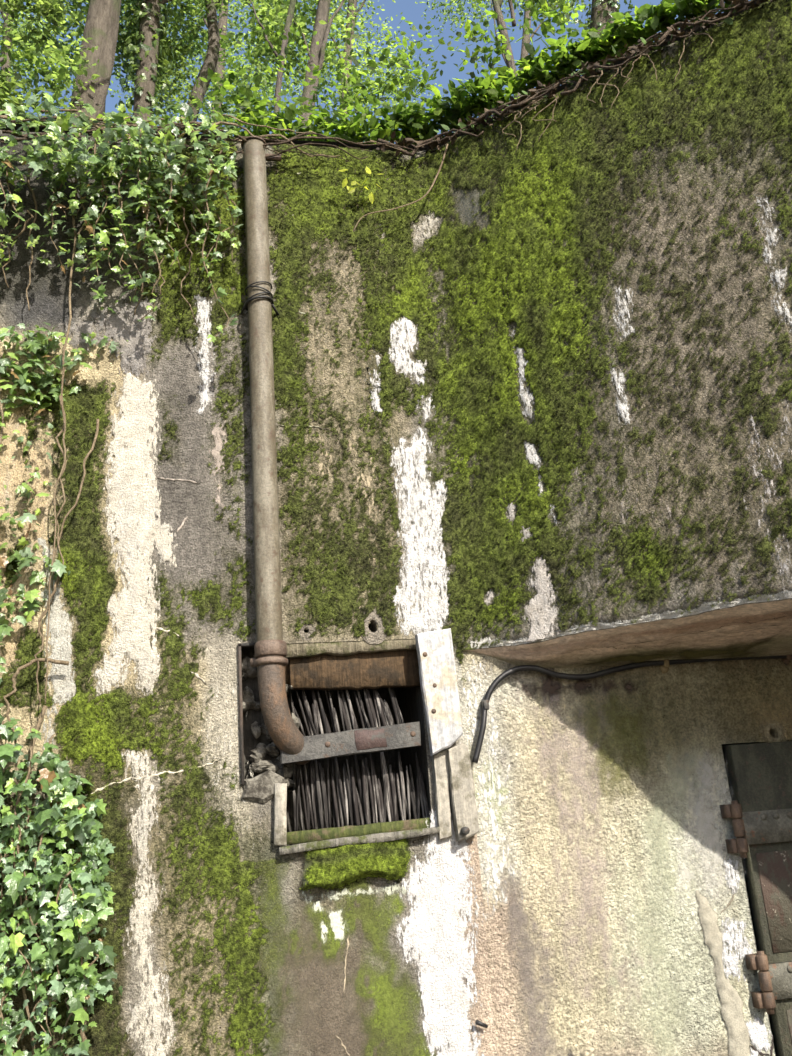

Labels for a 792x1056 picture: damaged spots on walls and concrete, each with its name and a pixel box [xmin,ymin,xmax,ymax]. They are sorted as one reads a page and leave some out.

damp [613,286,636,340]
damp [507,326,535,422]
damp [611,367,631,424]
damp [365,317,452,635]
damp [302,403,792,1056]
peeling [723,856,741,894]
peeling [719,917,753,983]